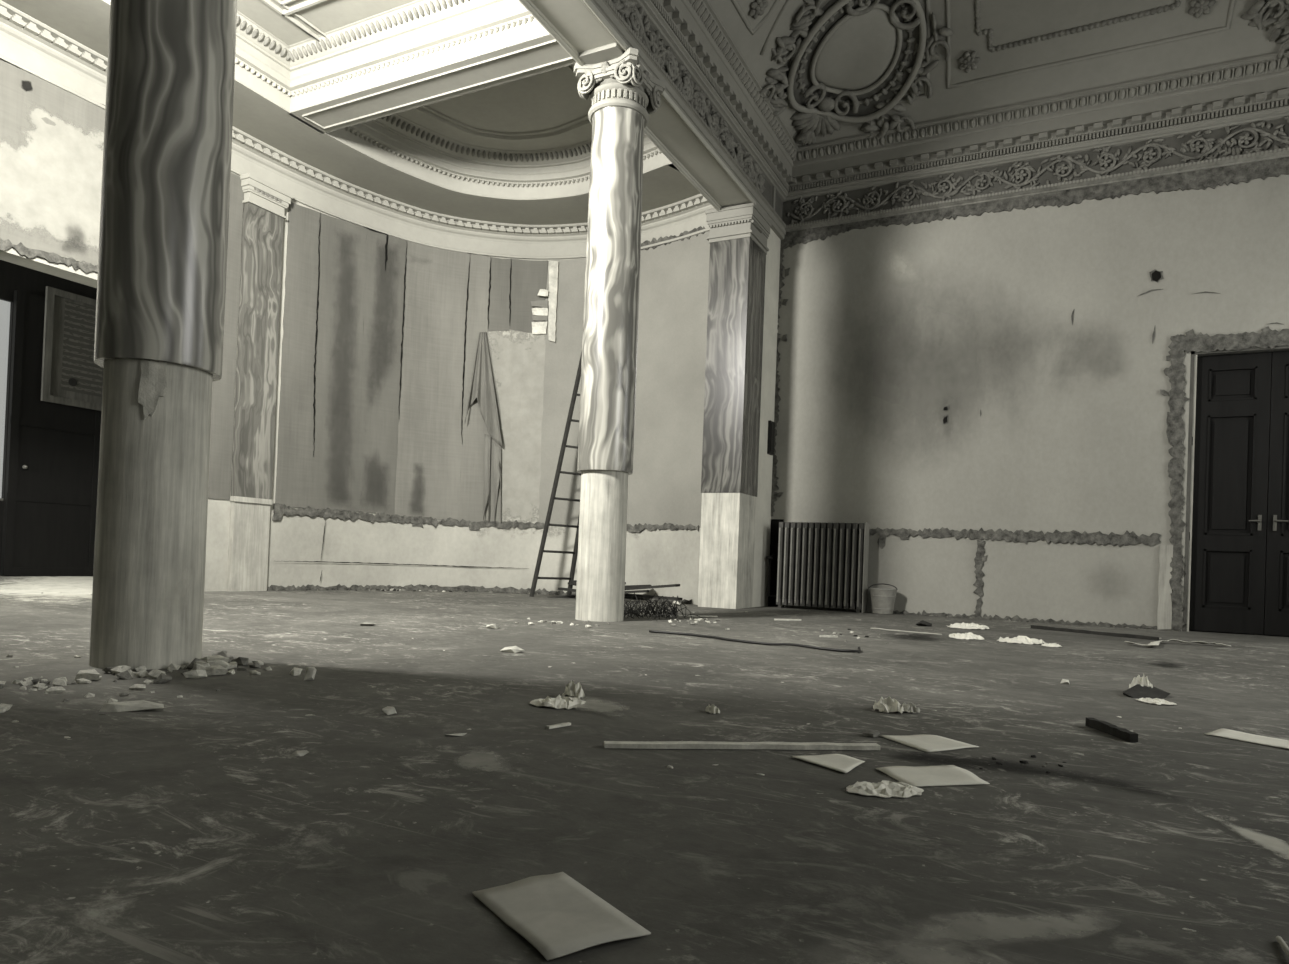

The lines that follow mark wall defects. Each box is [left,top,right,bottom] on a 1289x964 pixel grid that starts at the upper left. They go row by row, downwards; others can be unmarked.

peeling [0,108,104,273]
peeling [272,329,559,533]
flaking render [627,523,699,533]
flaking render [771,147,1289,516]
flaking render [869,326,1289,631]